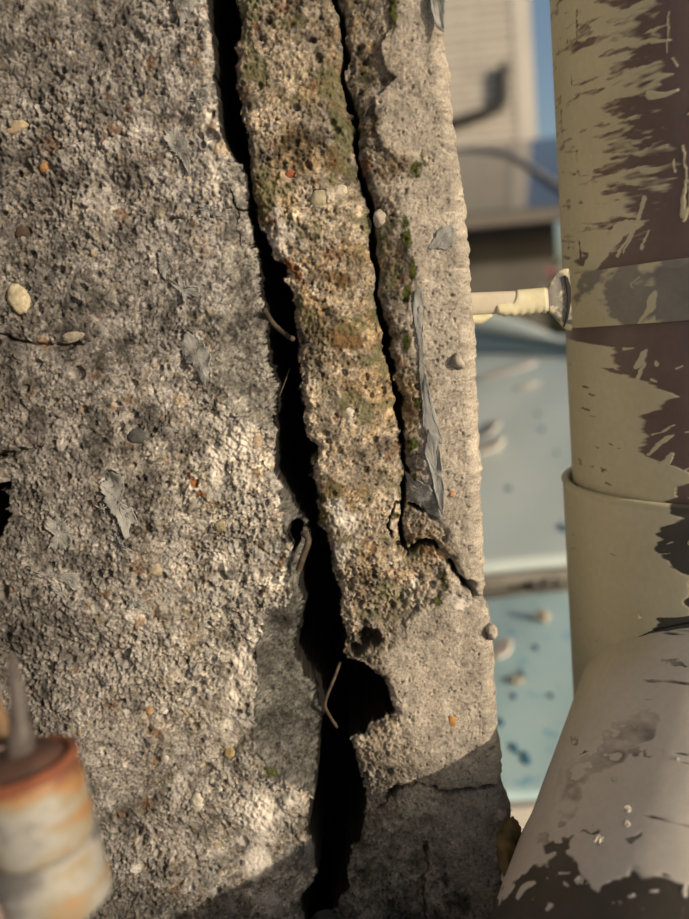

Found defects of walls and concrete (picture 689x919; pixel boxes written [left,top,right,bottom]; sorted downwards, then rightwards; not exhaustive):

efflorescence [271,208,309,252]
leakage [323,263,354,287]
efflorescence [208,412,261,492]
crack [168,0,494,919]
efflorescence [327,498,360,532]
leakage [212,547,234,572]
efflorescence [335,545,350,562]
efflorescence [449,598,471,611]